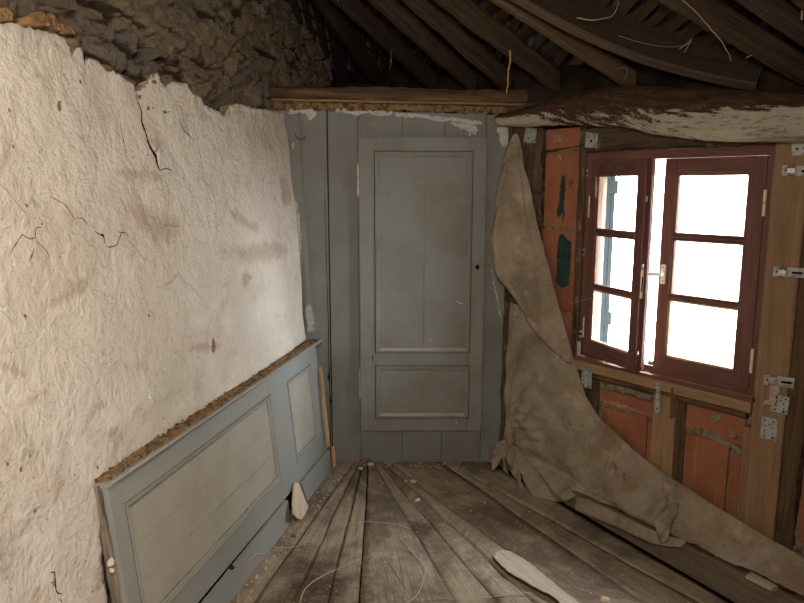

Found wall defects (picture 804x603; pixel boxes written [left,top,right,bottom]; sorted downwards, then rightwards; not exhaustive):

crack [121,95,172,172]
peeling [289,109,317,121]
peeling [329,108,483,136]
crack [52,197,144,259]